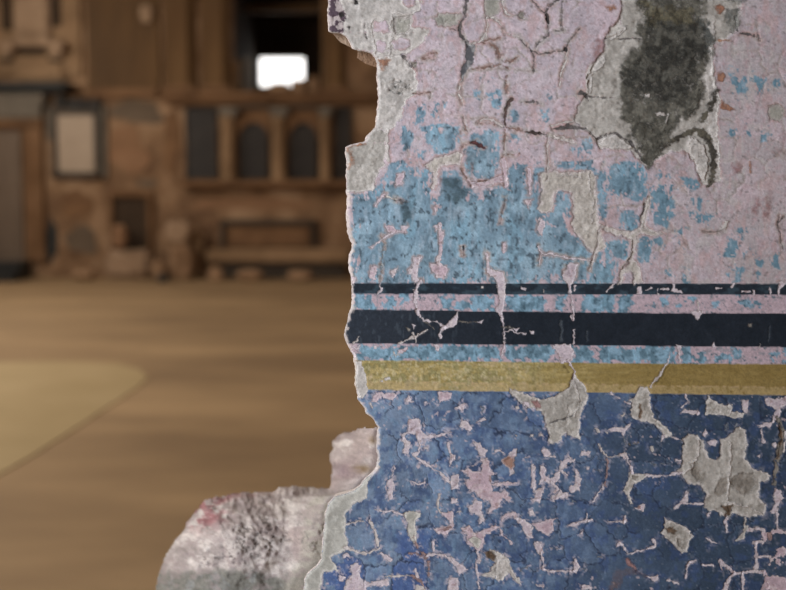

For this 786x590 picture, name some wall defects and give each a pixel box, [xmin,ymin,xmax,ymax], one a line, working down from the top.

spalling [328,0,429,207]
crack [454,0,641,182]
leakage [619,0,719,188]
leakage [725,0,742,32]
peeling [351,336,414,408]
peeling [408,256,422,283]
peeling [430,206,448,279]
crack [398,252,534,358]
spalling [525,167,682,295]
spalling [156,427,425,590]
spalling [401,375,601,590]
spalling [595,387,786,590]